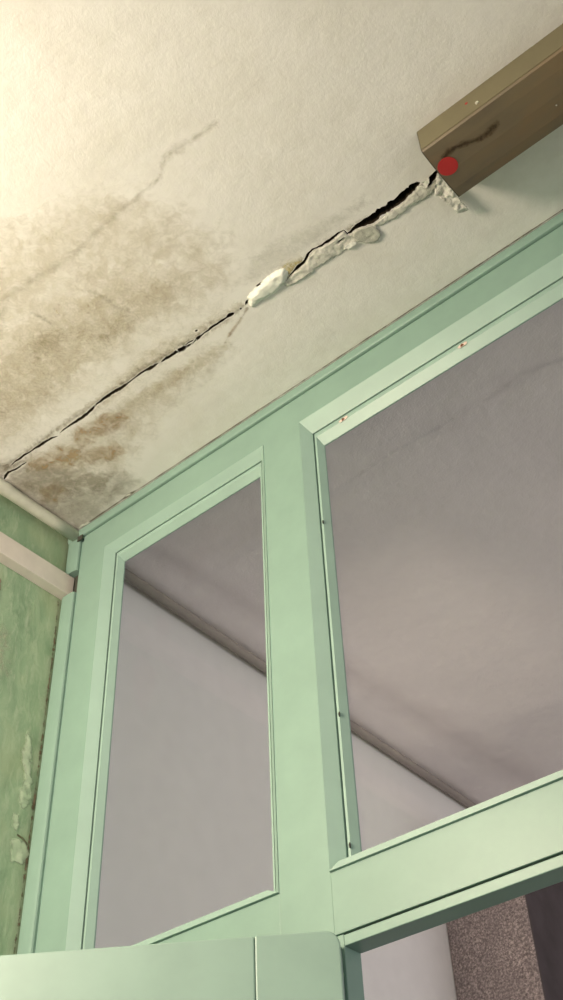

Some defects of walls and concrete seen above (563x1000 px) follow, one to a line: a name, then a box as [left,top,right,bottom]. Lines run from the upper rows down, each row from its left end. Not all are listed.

crack [289,171,438,276]
flaking render [284,175,468,286]
crack [4,282,262,479]
crack [82,209,563,527]
peeling [11,734,33,864]